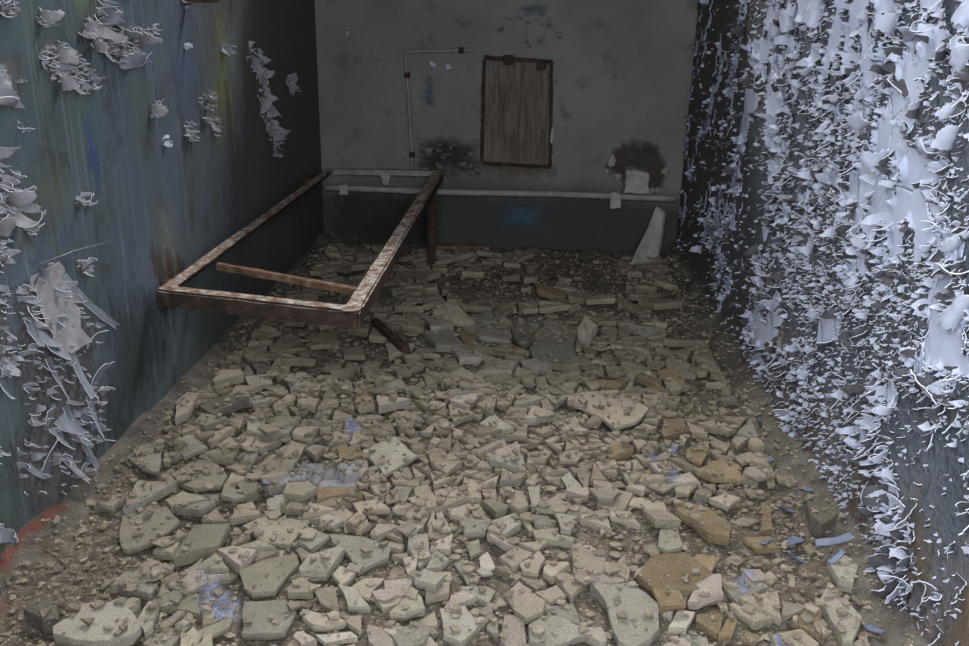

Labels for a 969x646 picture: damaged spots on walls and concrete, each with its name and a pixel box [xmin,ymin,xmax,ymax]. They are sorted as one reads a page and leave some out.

peeling [0,57,28,109]
peeling [36,7,107,94]
peeling [78,0,163,70]
peeling [0,147,120,513]
peeling [676,0,969,646]
peeling [0,522,19,544]